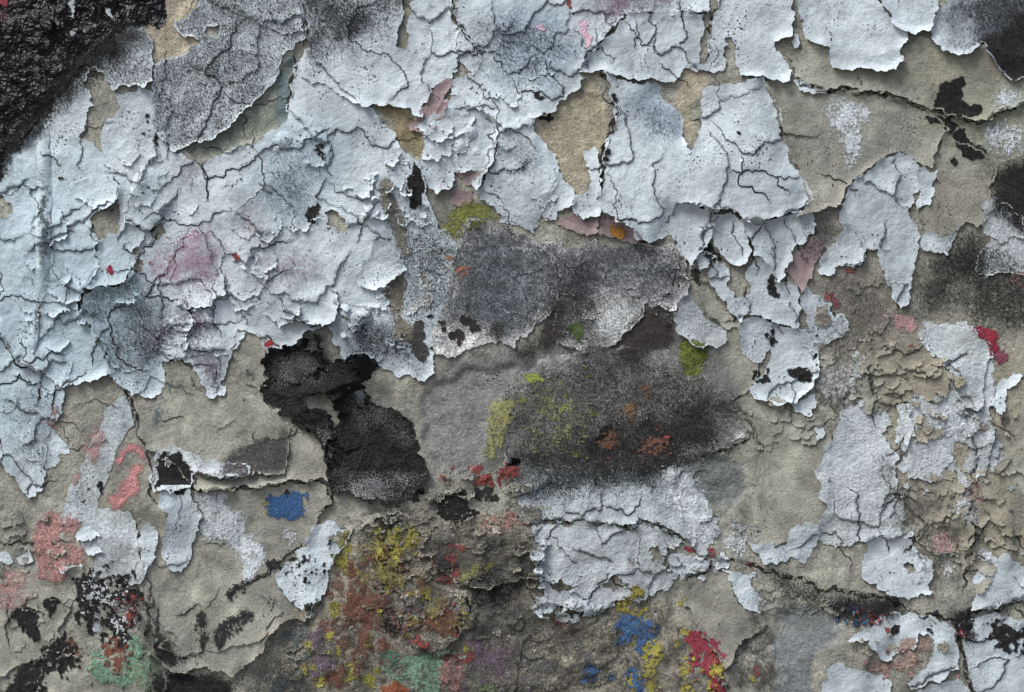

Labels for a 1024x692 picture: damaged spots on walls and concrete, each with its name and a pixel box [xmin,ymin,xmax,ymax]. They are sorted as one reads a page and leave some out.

crack [348,0,916,334]
crack [0,0,434,534]
peeling [553,327,576,346]
peeling [647,285,669,308]
spalling [913,415,946,443]
crack [505,345,1024,692]
flaking render [341,504,471,622]
crack [391,586,458,659]
peeling [411,448,718,692]
peeling [821,663,892,692]
peeling [849,611,1024,692]
peeling [971,553,1024,611]